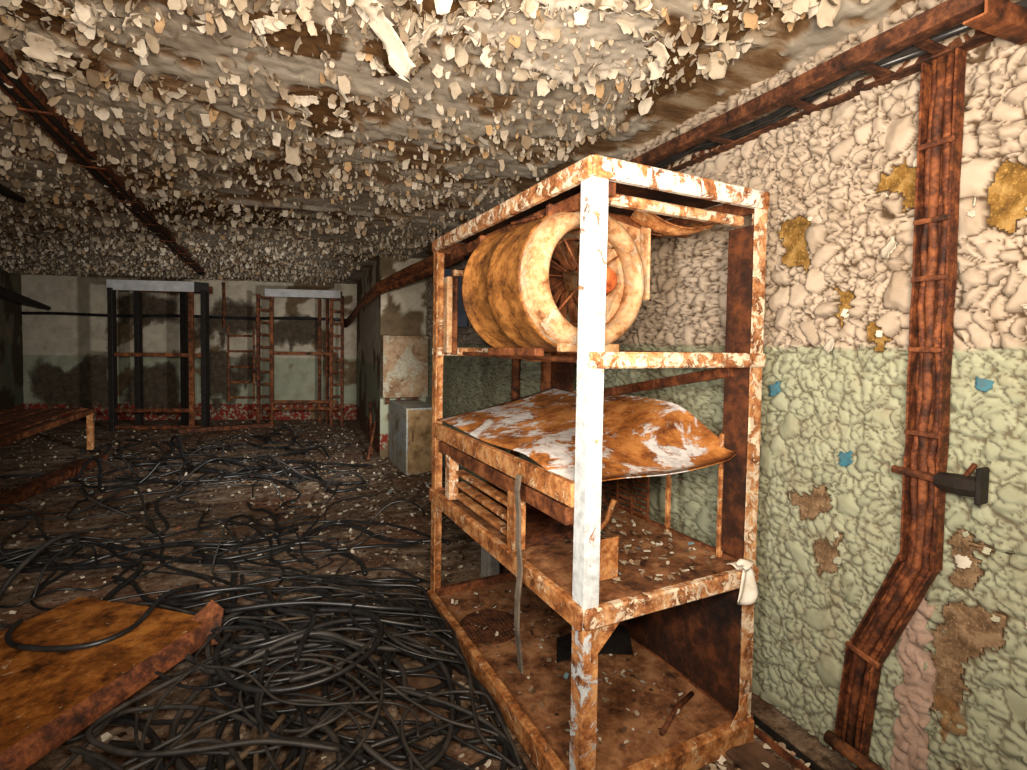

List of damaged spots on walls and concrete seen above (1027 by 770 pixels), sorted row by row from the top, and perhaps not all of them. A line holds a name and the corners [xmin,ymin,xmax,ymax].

peeling [0,0,842,286]
peeling [876,158,917,212]
peeling [966,160,1027,233]
water stain [116,292,177,324]
water stain [194,298,263,410]
water stain [269,315,318,351]
peeling [859,322,891,351]
water stain [29,355,109,408]
water stain [126,361,180,415]
peeling [787,485,832,527]
peeling [814,531,843,574]
flaking render [890,529,1006,770]